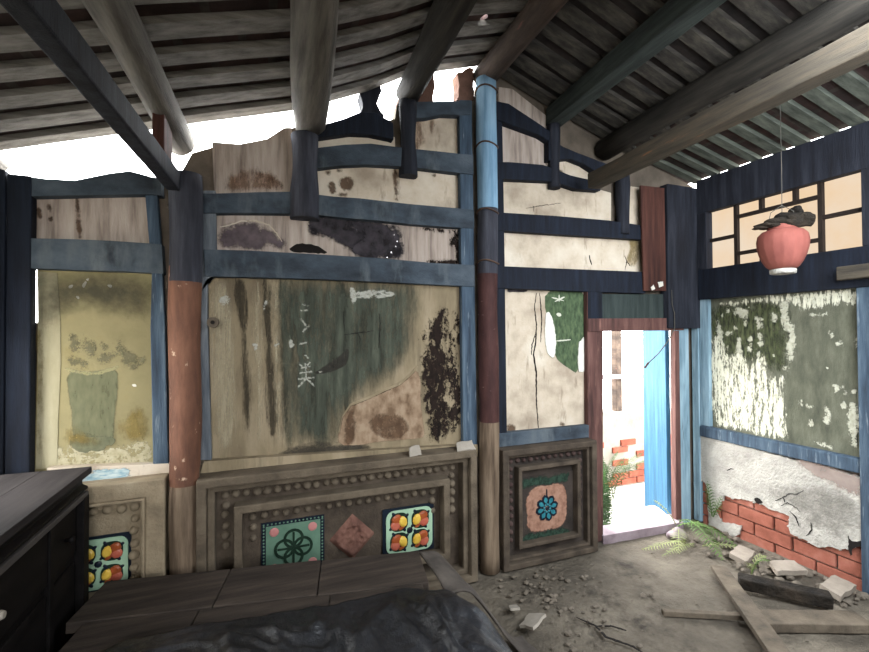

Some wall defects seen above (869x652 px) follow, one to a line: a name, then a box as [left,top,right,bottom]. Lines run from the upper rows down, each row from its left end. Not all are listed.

water stain [212,280,288,446]
water stain [421,308,461,442]
crack [531,293,542,428]
water stain [711,299,791,370]
peeling [711,289,856,438]
peeling [832,384,859,448]
spalling [700,436,862,592]
crack [775,491,813,536]